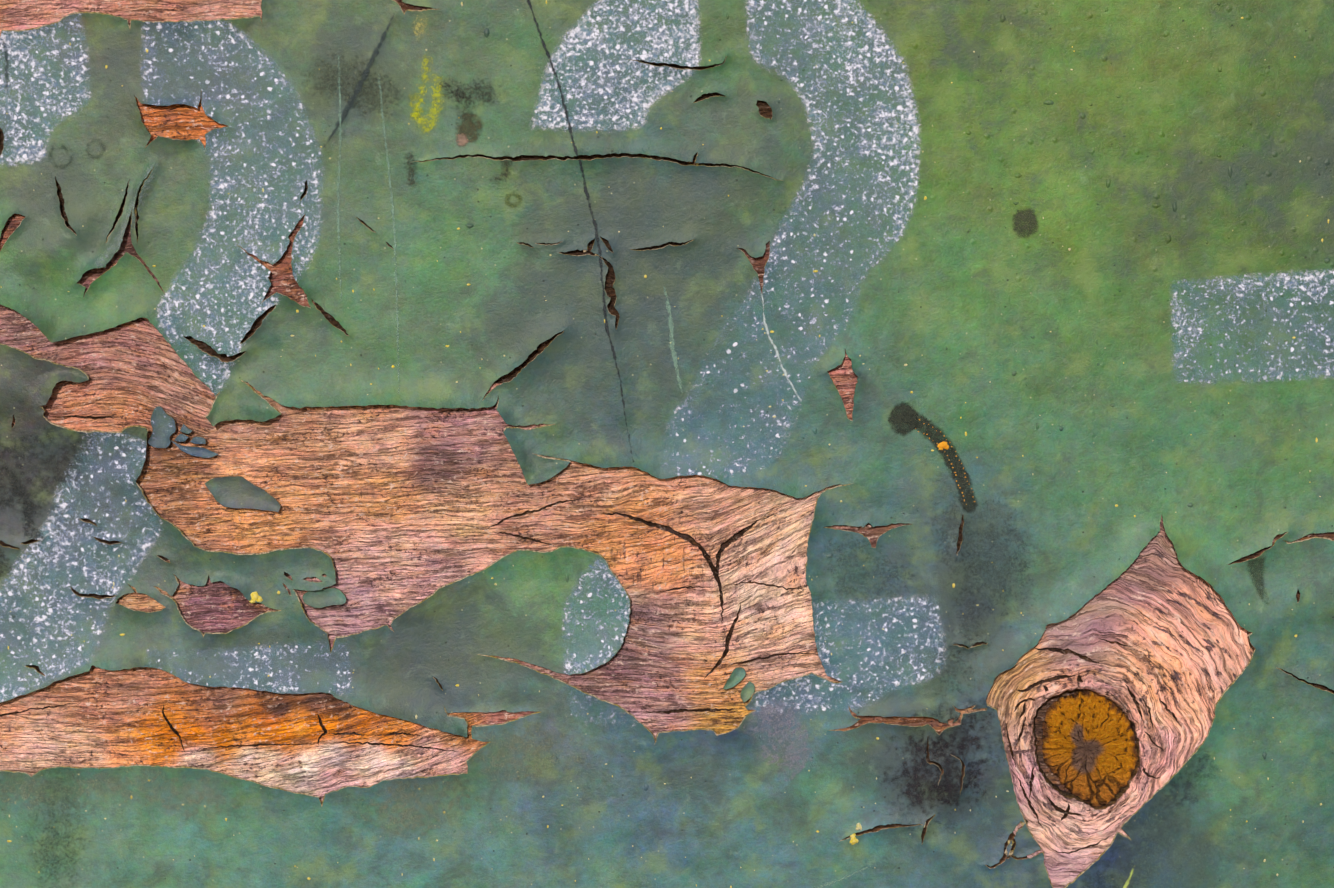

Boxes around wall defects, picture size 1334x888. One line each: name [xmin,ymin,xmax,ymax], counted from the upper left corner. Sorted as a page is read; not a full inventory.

peeling [0,0,274,45]
peeling [393,0,437,14]
peeling [134,91,228,148]
crack [413,0,783,462]
peeling [0,205,911,745]
crack [486,499,814,714]
peeling [1270,528,1334,547]
peeling [0,647,540,806]
peeling [827,515,1271,888]